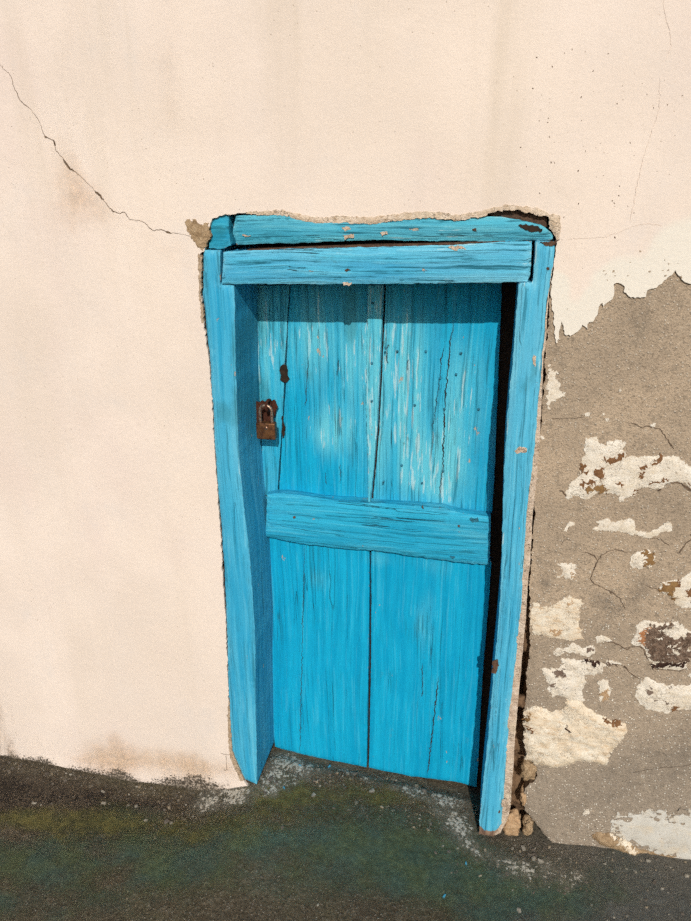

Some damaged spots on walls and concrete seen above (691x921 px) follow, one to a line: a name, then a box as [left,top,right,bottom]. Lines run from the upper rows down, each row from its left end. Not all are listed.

crack [1,66,187,236]
crack [562,539,627,608]
flaking render [522,259,691,860]
water stain [0,746,598,921]
peeling [399,784,482,865]
peeling [494,859,582,892]